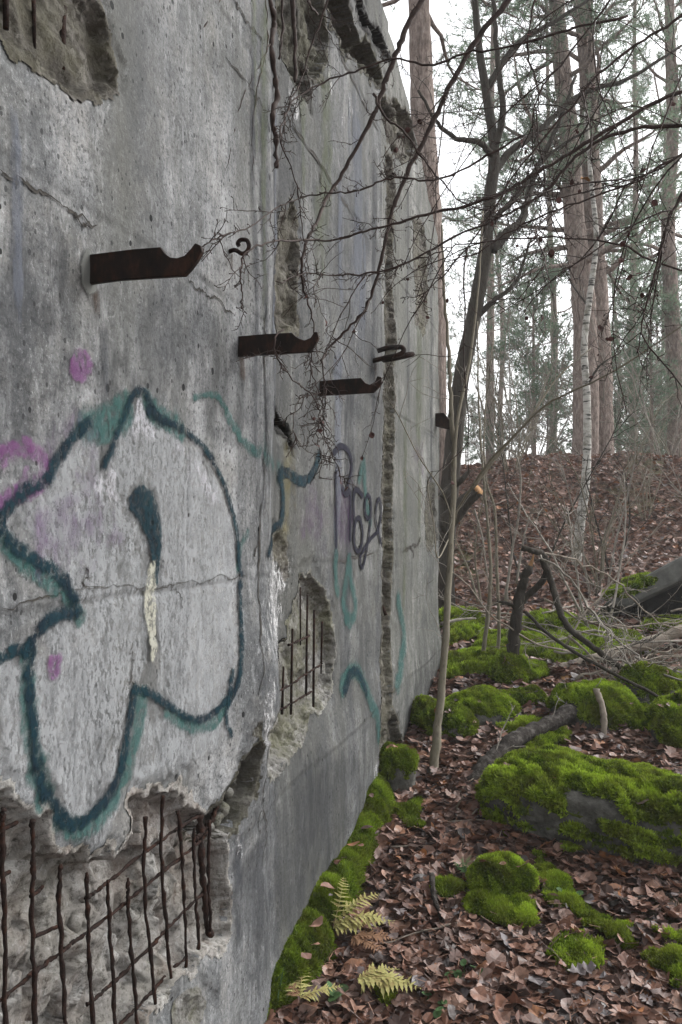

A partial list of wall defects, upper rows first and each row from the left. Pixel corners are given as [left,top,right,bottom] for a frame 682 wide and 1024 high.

spalling [0,0,120,107]
crack [0,169,97,228]
crack [3,306,294,696]
spalling [273,0,417,773]
spalling [264,528,337,783]
spalling [0,775,242,1024]